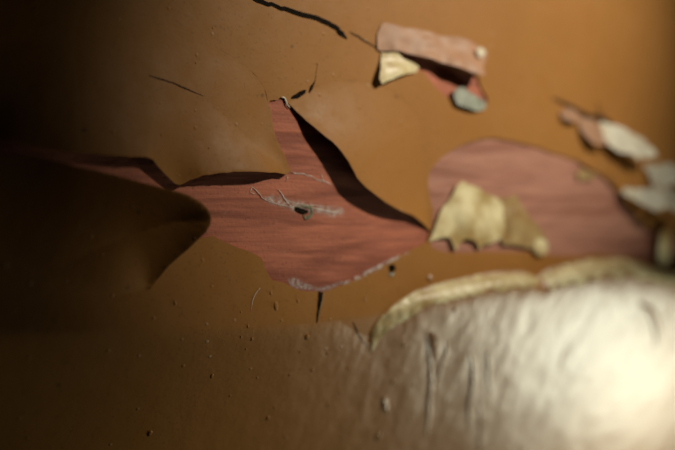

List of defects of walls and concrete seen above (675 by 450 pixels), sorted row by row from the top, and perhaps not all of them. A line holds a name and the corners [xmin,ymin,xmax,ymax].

crack [253,0,377,49]
peeling [0,23,675,323]